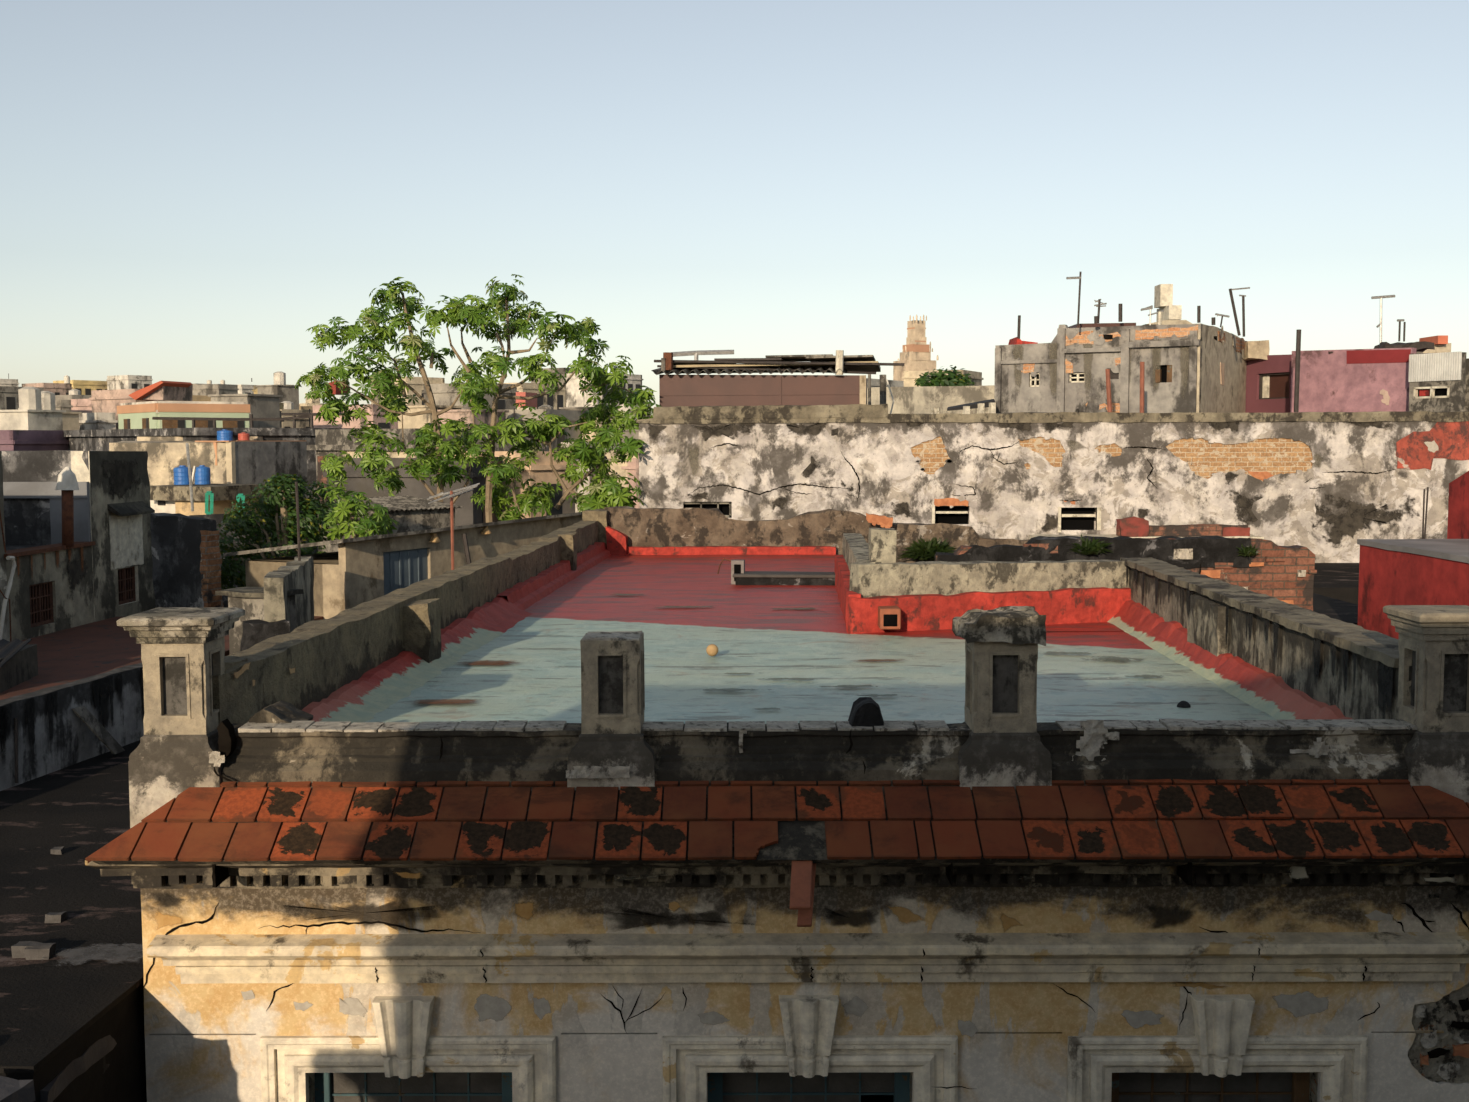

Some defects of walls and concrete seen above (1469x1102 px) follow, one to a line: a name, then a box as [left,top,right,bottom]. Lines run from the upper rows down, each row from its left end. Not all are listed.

crack [693,452,860,501]
flaking render [910,436,953,474]
flaking render [1166,435,1315,482]
peeling [1396,421,1469,470]
leakage [93,674,122,728]
leakage [0,691,57,763]
leakage [286,901,438,930]
leakage [613,909,747,929]
leakage [826,909,874,927]
crack [1393,903,1469,933]
spalling [1408,983,1469,1084]